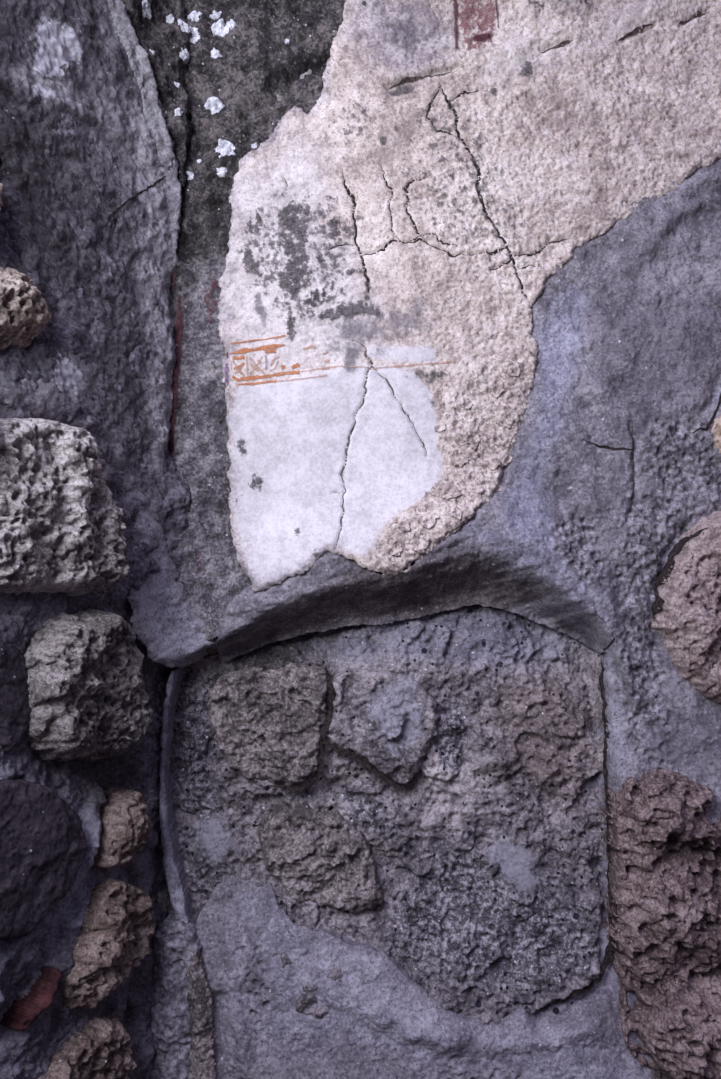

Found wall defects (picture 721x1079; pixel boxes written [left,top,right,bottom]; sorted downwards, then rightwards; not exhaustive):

crack [328,70,569,298]
crack [335,340,427,549]
crack [692,394,721,433]